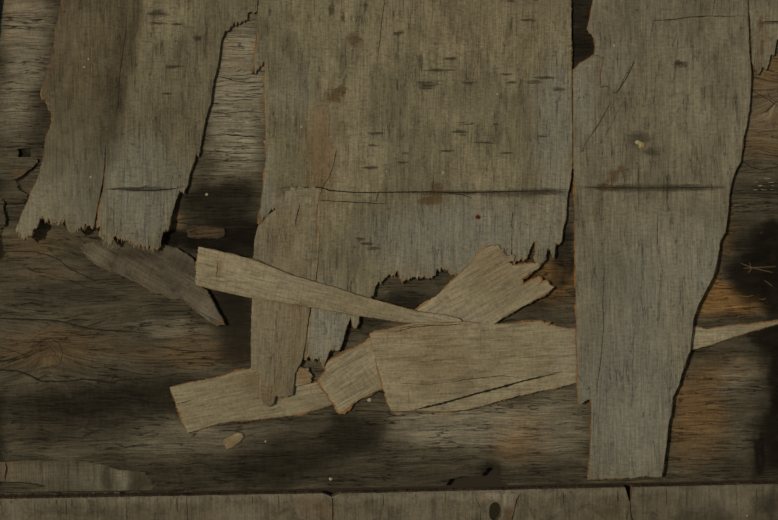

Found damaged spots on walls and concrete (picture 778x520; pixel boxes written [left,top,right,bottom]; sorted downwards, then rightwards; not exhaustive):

spalling [0,158,38,236]
peeling [186,224,226,239]
crack [283,153,567,224]
crack [587,187,778,209]
water stain [728,221,778,474]